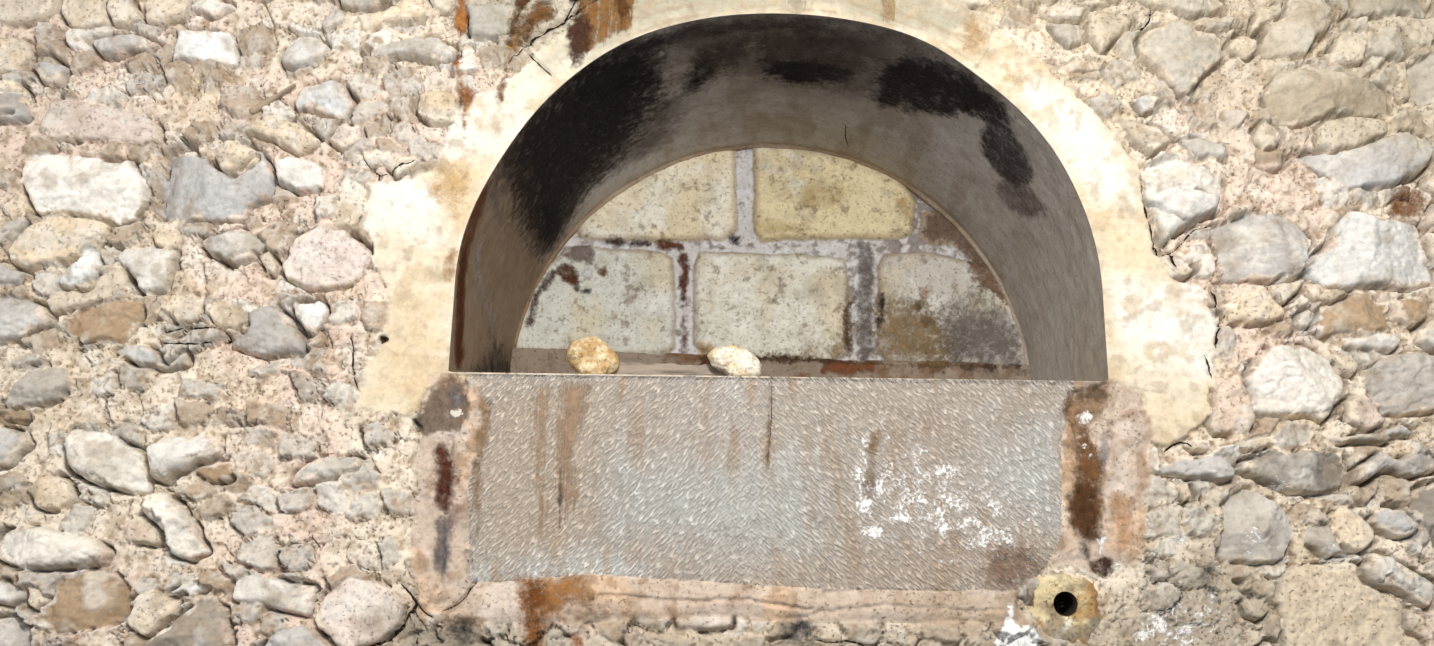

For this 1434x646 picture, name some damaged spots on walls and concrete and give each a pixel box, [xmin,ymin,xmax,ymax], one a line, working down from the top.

corrosion [508,0,556,53]
corrosion [566,0,634,65]
water stain [564,245,595,278]
water stain [756,212,1020,372]
water stain [848,410,1059,579]
corrosion [518,577,594,646]